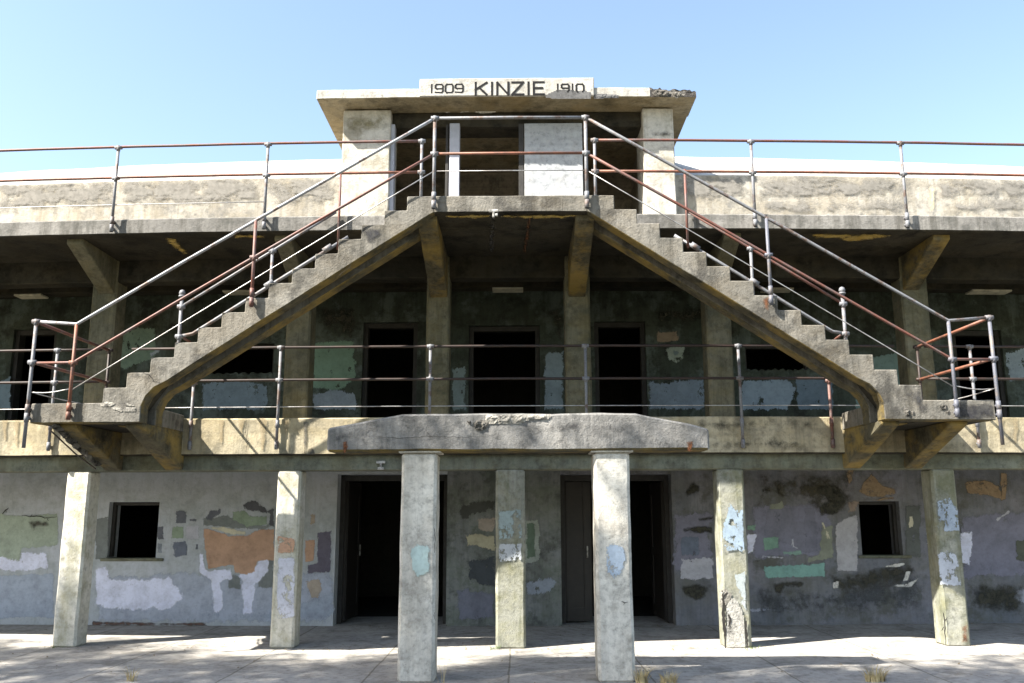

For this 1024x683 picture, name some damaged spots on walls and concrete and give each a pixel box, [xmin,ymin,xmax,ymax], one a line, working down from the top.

spalling [467,414,551,430]
leakage [764,476,848,515]
peeling [965,473,1007,501]
leakage [974,585,1021,611]
spalling [720,589,745,647]